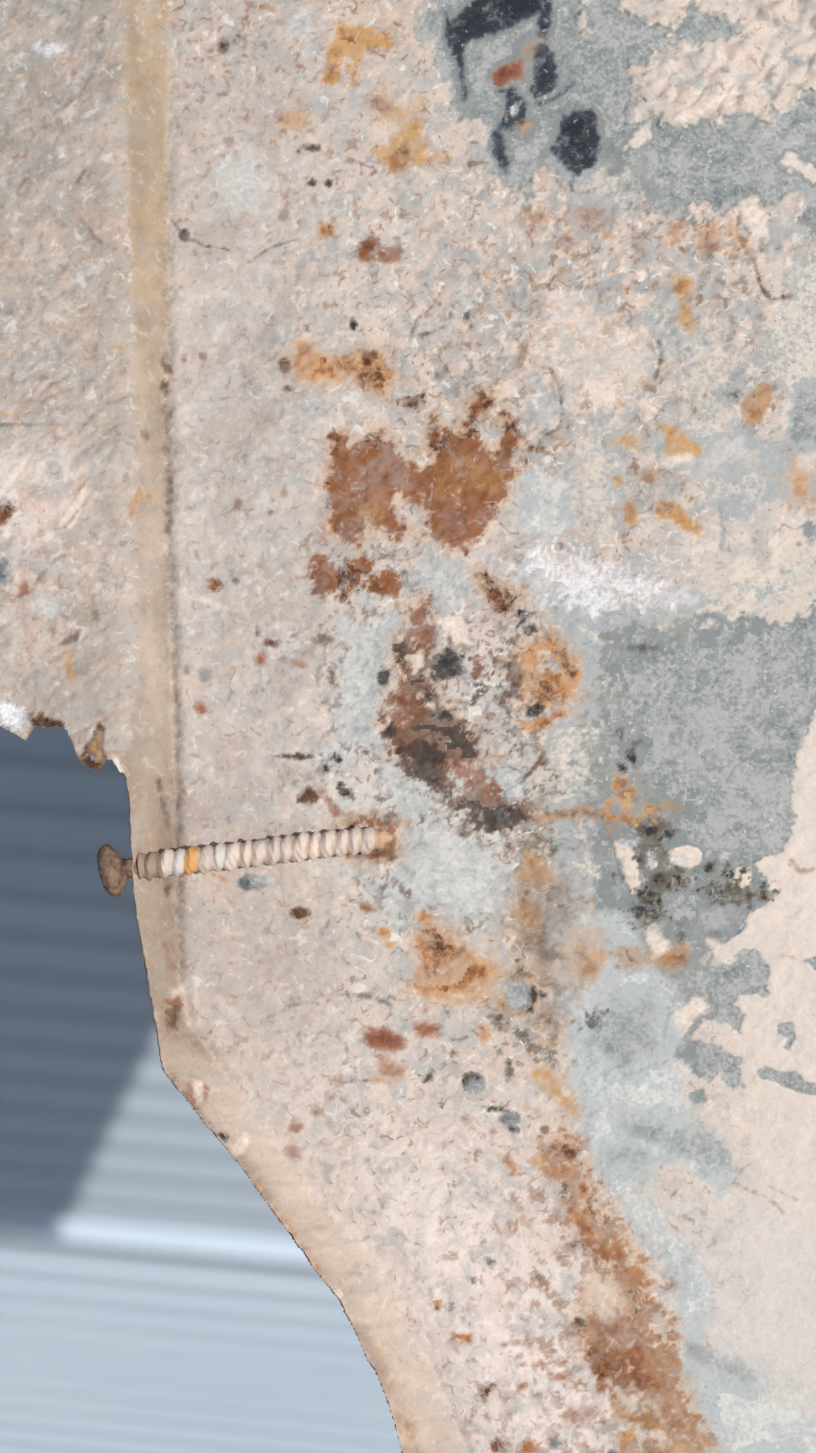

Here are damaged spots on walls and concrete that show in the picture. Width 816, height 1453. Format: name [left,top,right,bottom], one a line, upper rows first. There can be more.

peeling [320,0,816,938]
rust [132,807,166,863]
rust [187,658,219,723]
rust [189,572,237,616]
rust [248,632,289,674]
rust [263,296,606,1168]
rust [153,935,196,1046]
rust [166,1070,350,1302]
rust [360,1051,736,1453]
peeling [566,905,816,1453]